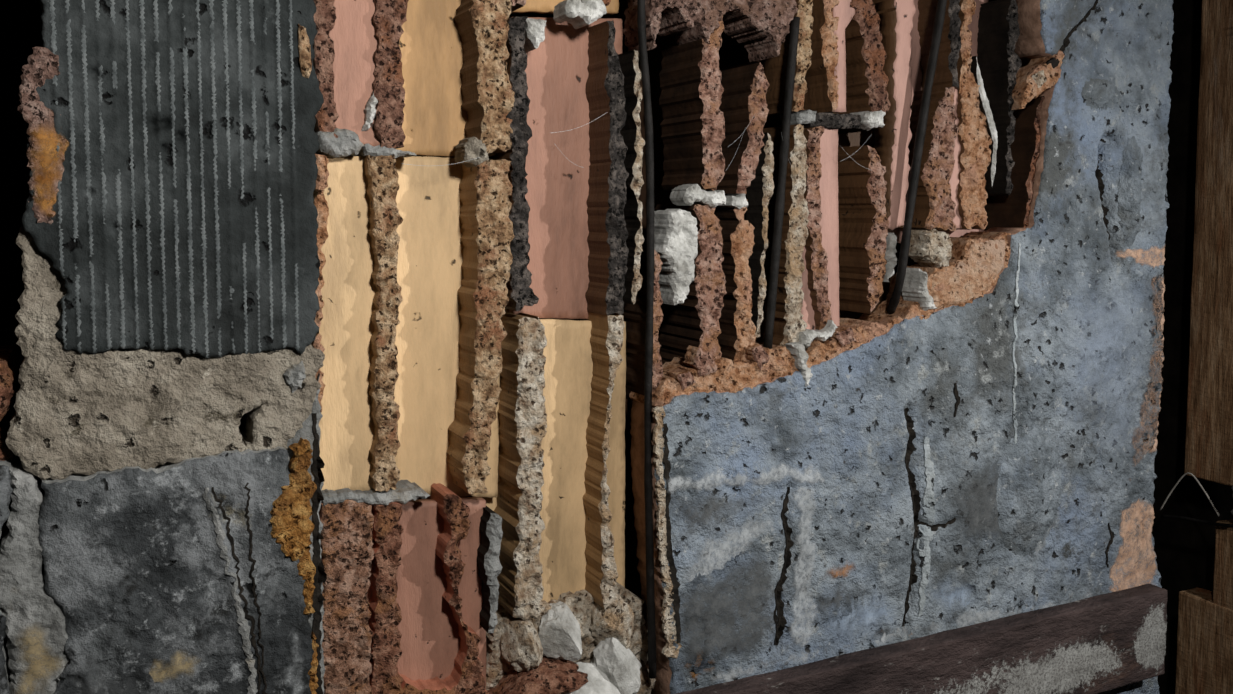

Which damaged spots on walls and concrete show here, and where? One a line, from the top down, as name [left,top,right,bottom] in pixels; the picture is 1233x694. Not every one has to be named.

spalling [622,0,798,62]
crack [1046,0,1098,68]
spalling [629,50,1065,407]
peeling [1095,139,1165,465]
corrosion [269,438,317,615]
crack [773,486,794,645]
crack [902,407,956,626]
peeling [1110,499,1157,592]
corrosion [308,631,319,694]